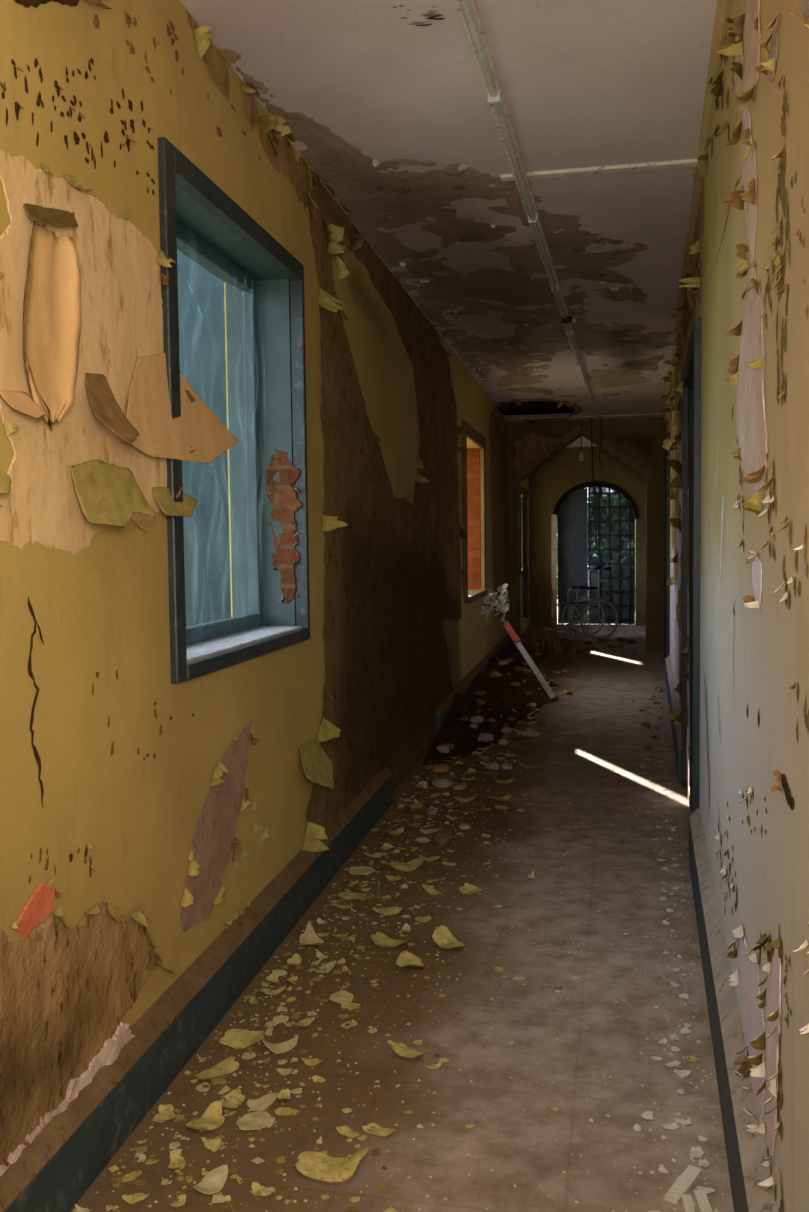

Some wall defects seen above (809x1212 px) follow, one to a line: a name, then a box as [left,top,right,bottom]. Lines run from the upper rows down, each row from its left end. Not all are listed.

spalling [0,0,809,852]
crack [28,596,44,806]
spalling [0,843,176,1176]
peeling [179,720,270,937]
peeling [715,770,809,1202]